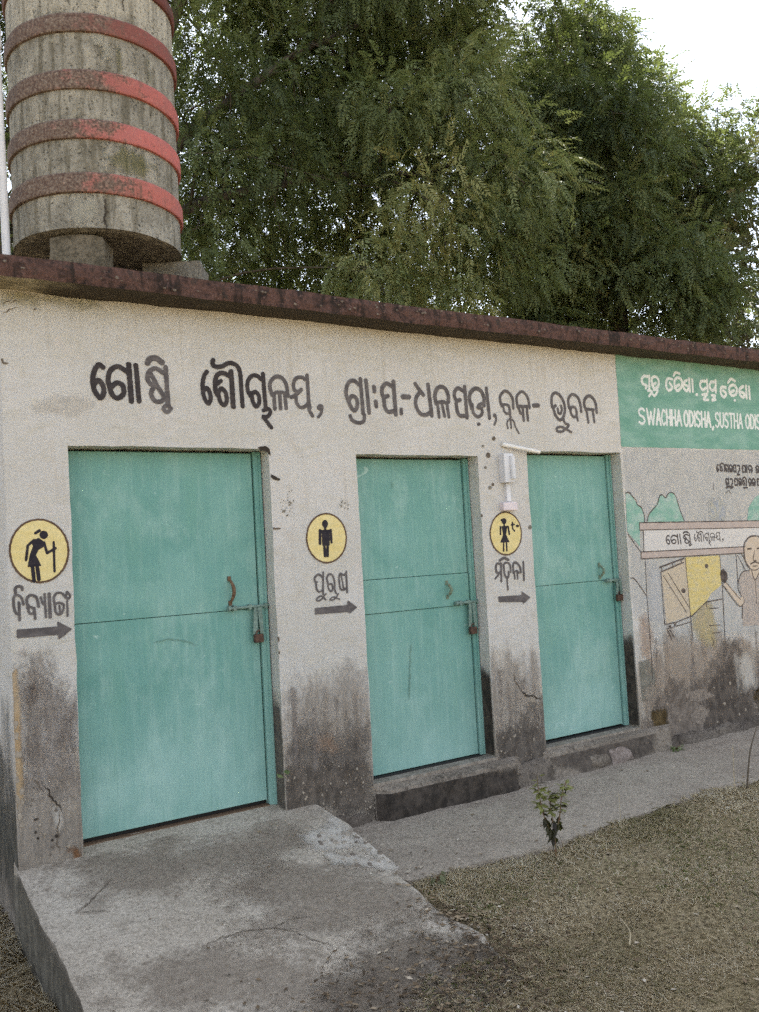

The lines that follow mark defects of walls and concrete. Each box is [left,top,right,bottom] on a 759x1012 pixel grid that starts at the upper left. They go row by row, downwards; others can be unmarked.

leakage [18,660,78,789]
leakage [273,632,759,821]
crack [32,773,62,852]
leakage [0,749,79,1012]
crack [73,879,111,913]
crack [202,916,329,947]